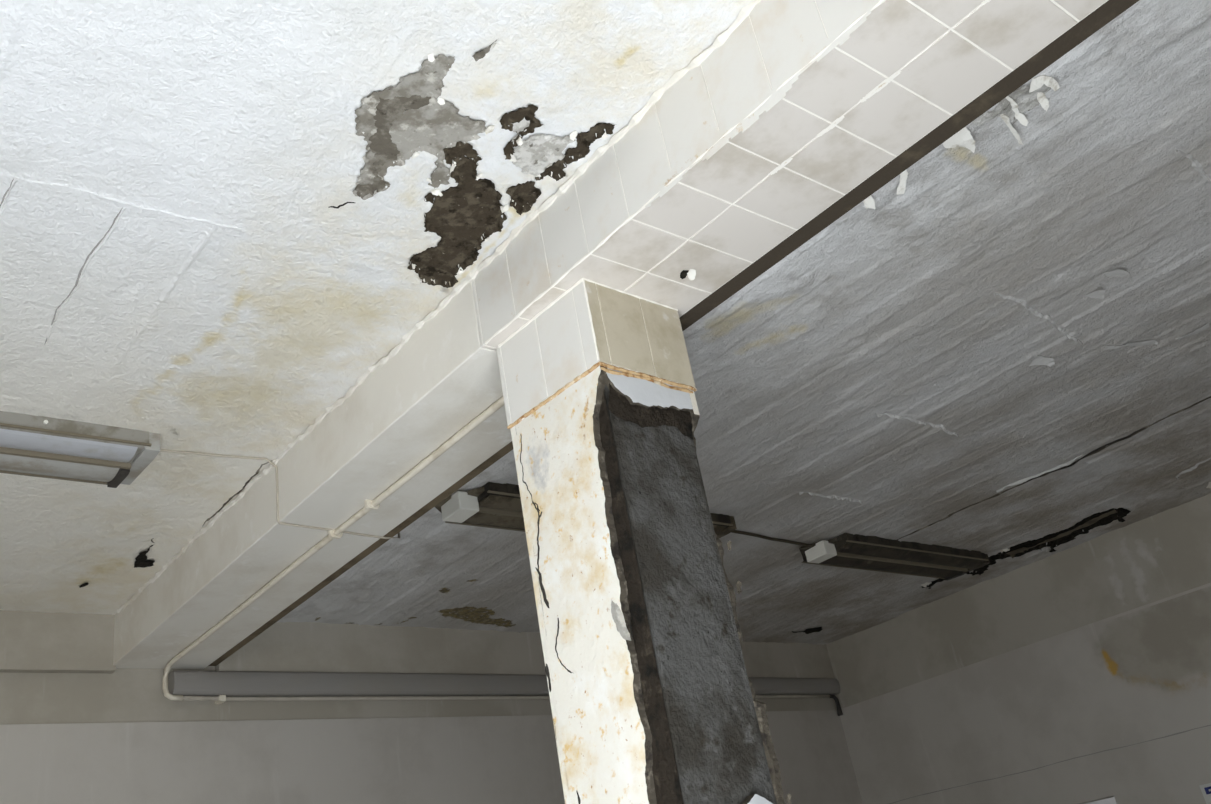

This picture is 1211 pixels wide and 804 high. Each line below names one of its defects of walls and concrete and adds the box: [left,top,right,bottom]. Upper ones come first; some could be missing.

crack [0,179,17,219]
flaking render [352,54,615,288]
flaking render [943,75,1060,153]
crack [45,207,126,344]
leakage [0,217,450,447]
rust [576,385,596,453]
crack [897,396,1211,540]
spalling [134,538,155,568]
crack [520,434,572,692]
spalling [599,383,791,804]
spalling [965,507,1131,576]
leakage [1084,531,1211,703]